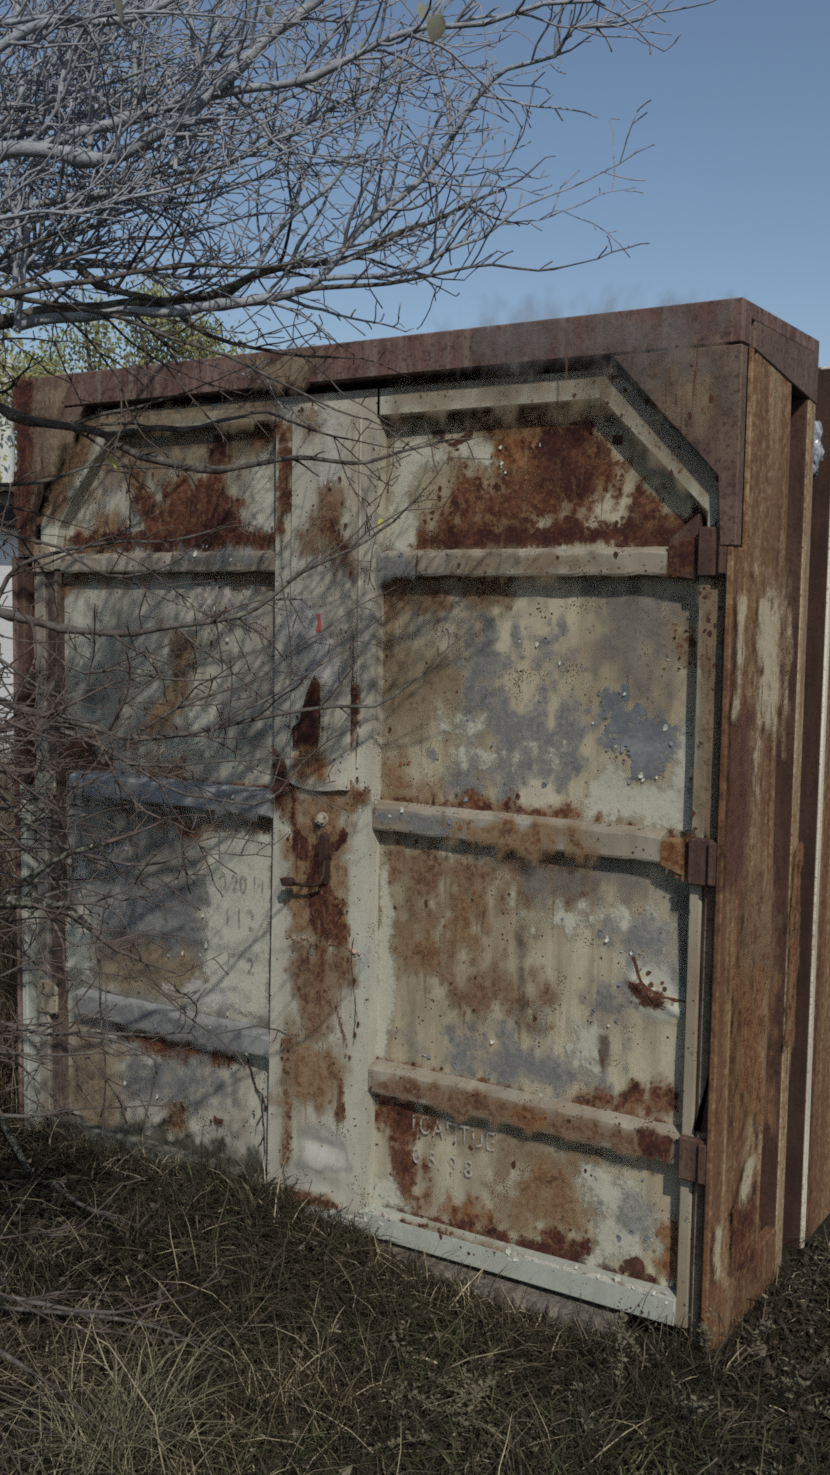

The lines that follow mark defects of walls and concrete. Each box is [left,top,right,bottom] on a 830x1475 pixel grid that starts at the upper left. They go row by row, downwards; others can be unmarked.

rust [10,374,358,577]
peeling [376,807,452,834]
rust [55,370,804,1168]
peeling [428,602,686,814]
peeling [666,623,698,670]
rust [284,1187,339,1210]
rust [369,1061,682,1289]
rust [730,1174,761,1285]